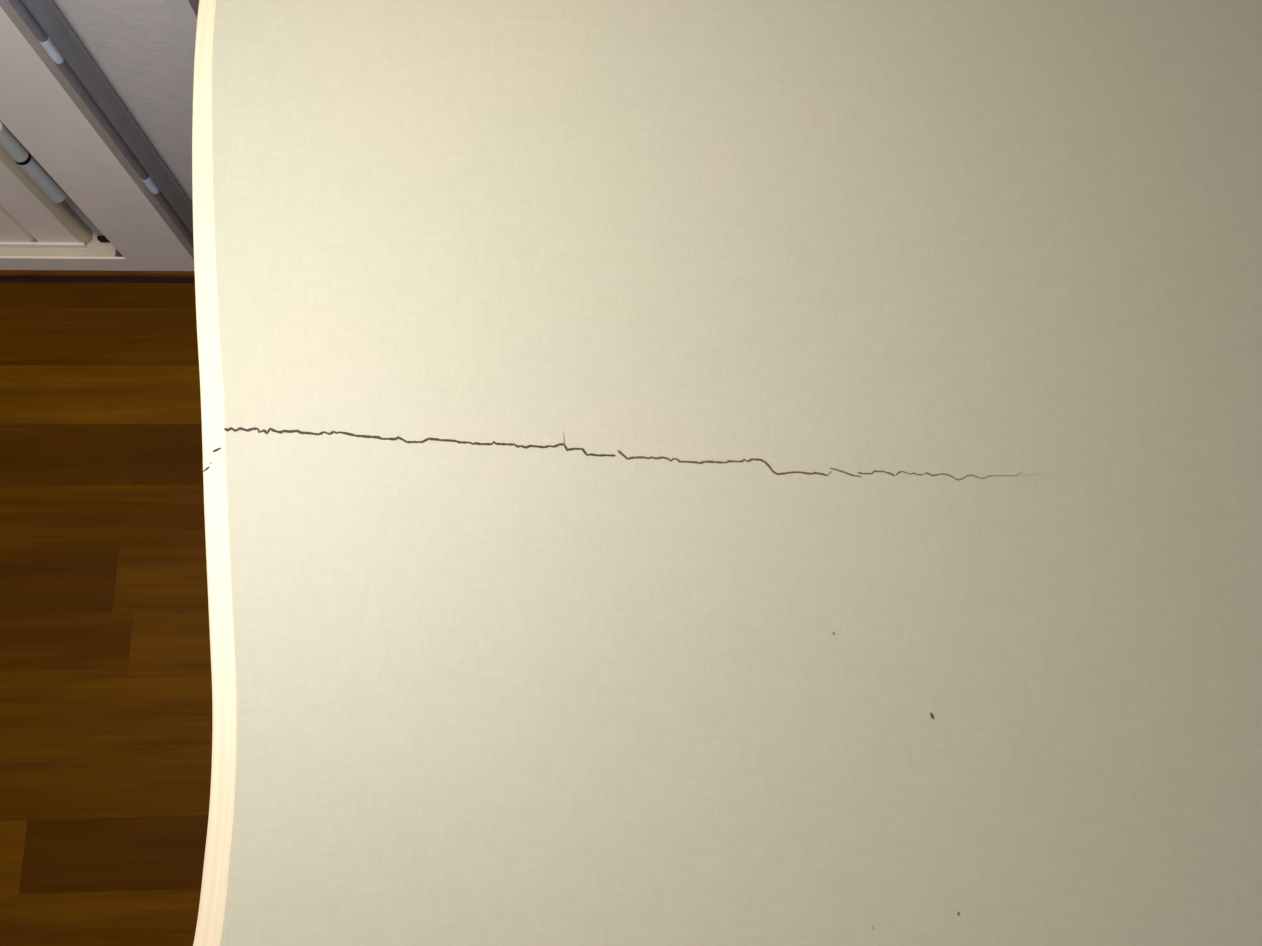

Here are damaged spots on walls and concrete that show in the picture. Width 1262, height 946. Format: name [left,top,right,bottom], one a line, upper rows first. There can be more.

crack [203,427,966,480]